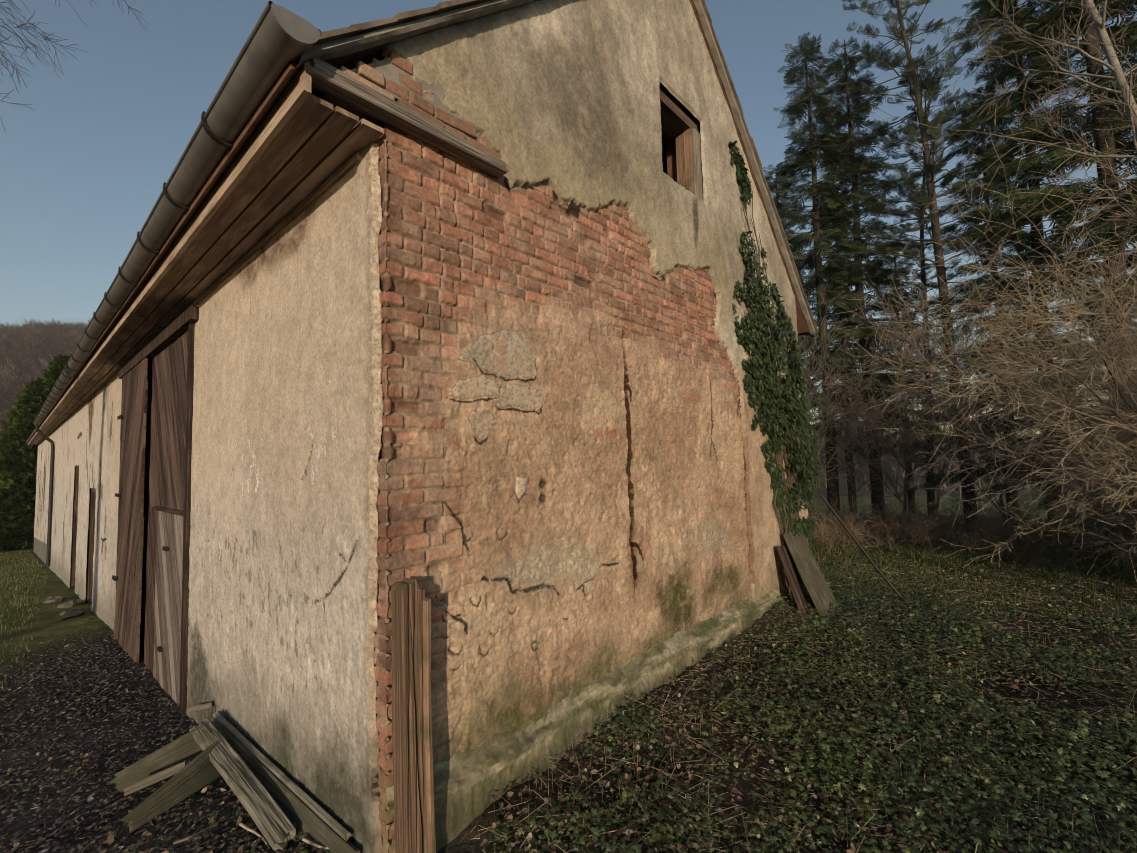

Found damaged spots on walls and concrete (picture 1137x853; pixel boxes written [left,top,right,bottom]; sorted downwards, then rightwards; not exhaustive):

crack [316,544,356,609]
crack [436,364,643,671]
spalling [365,123,752,853]